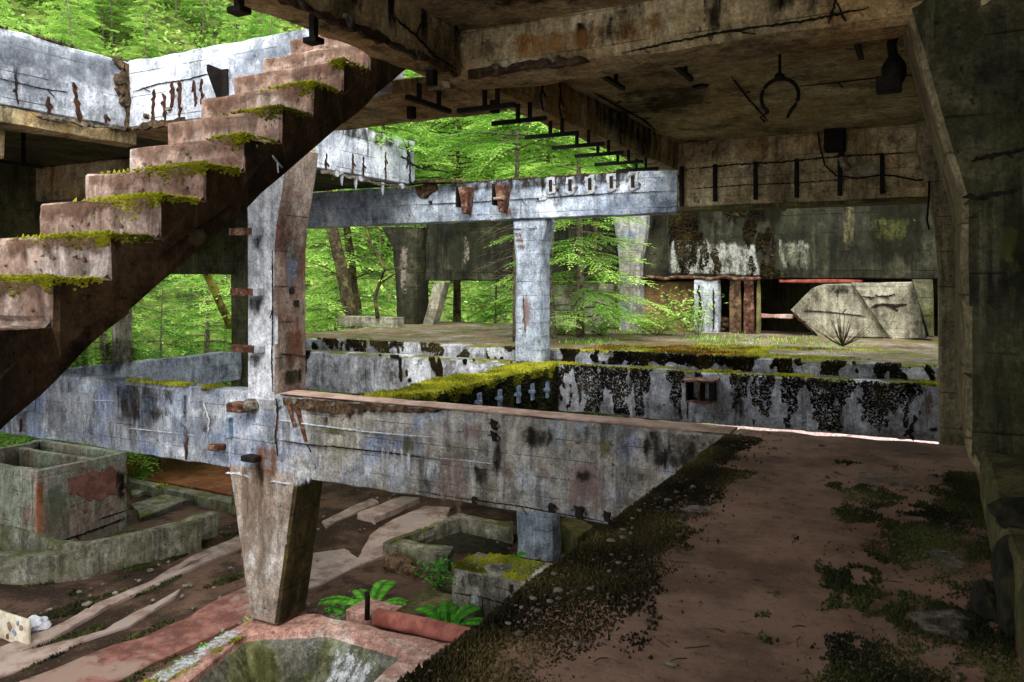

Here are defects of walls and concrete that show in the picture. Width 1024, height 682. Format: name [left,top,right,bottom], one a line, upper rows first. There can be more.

crack [621,0,869,53]
spalling [4,0,590,267]
damp [671,240,759,275]
damp [651,209,809,267]
peeling [67,466,126,513]